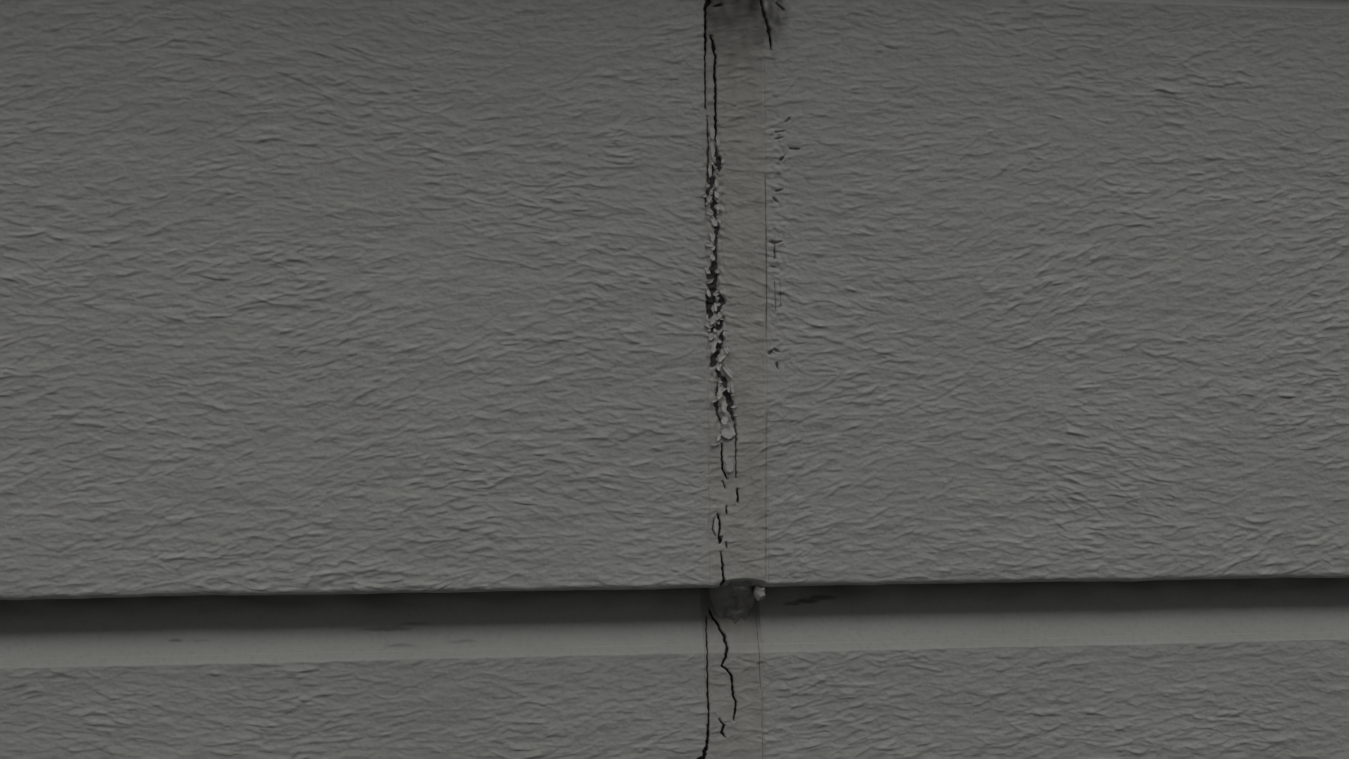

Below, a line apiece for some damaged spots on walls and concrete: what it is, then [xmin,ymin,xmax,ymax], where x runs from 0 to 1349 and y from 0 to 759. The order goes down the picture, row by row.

crack [760,0,783,50]
crack [762,182,770,322]
crack [697,0,763,759]